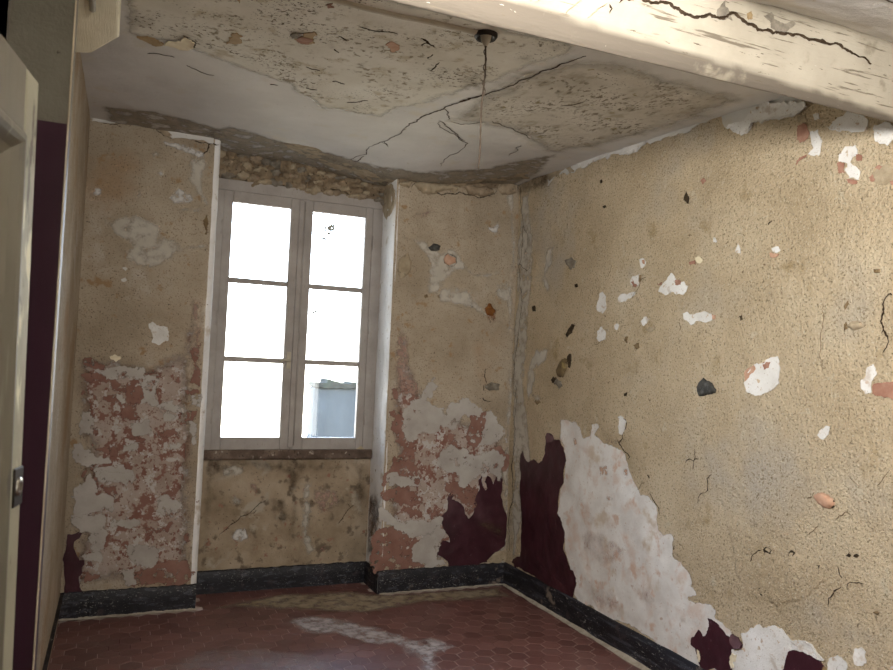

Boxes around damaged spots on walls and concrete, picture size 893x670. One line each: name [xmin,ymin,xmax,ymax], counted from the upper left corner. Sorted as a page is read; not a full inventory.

crack [566,0,872,65]
damp [164,142,207,211]
damp [106,107,549,186]
crack [351,56,586,166]
peeling [128,0,893,220]
damp [111,216,177,266]
damp [418,242,489,316]
peeling [149,322,169,345]
damp [498,195,547,563]
peeling [860,364,893,400]
peeling [63,332,202,593]
peeling [368,337,867,670]